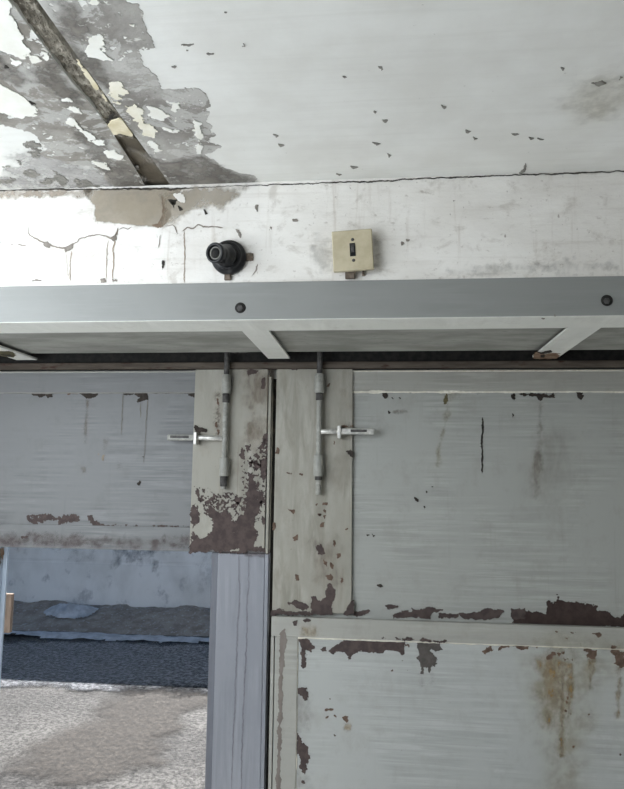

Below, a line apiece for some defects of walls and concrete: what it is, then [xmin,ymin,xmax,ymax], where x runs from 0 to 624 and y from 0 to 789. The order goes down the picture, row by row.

peeling [0,0,145,187]
peeling [37,0,257,185]
crack [0,0,624,191]
water stain [0,141,238,226]
crack [0,227,131,283]
crack [158,224,222,282]
rust [152,433,280,555]
rust [0,513,138,564]
rust [270,540,447,674]
rust [385,594,624,640]
rust [610,645,624,668]
rust [297,733,310,784]